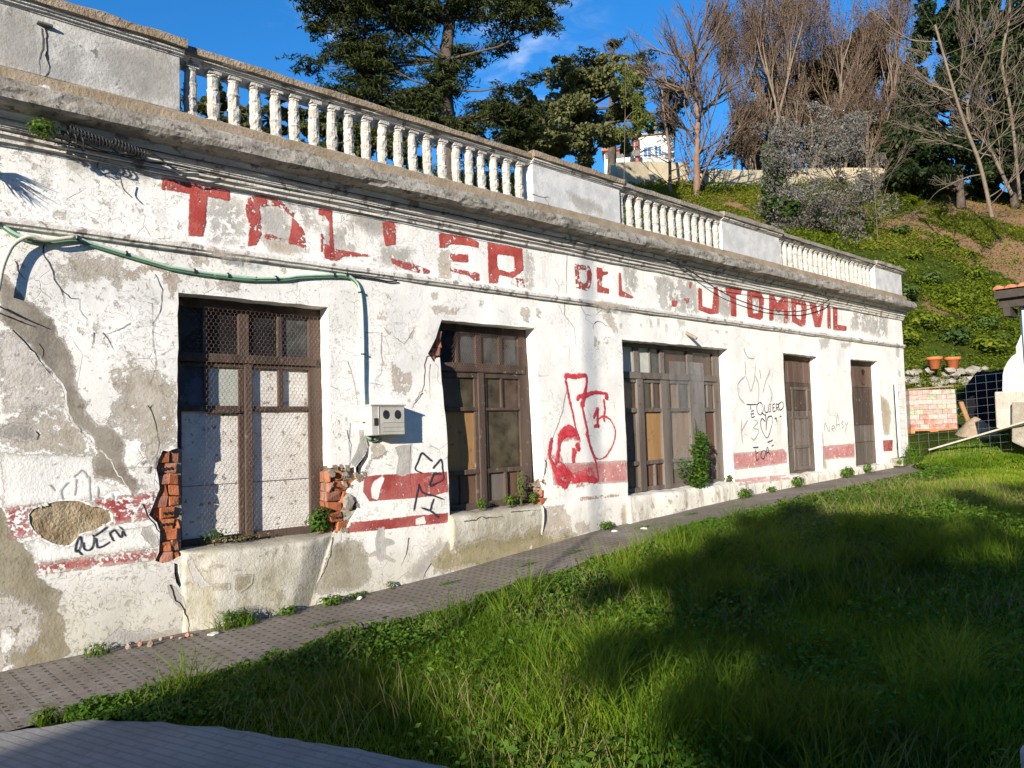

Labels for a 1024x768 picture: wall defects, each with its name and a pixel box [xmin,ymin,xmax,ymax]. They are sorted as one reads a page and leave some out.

crack [38,28,50,77]
crack [13,244,169,457]
peeling [0,274,182,672]
peeling [167,585,186,609]
crack [170,572,189,632]
peeling [315,430,412,600]